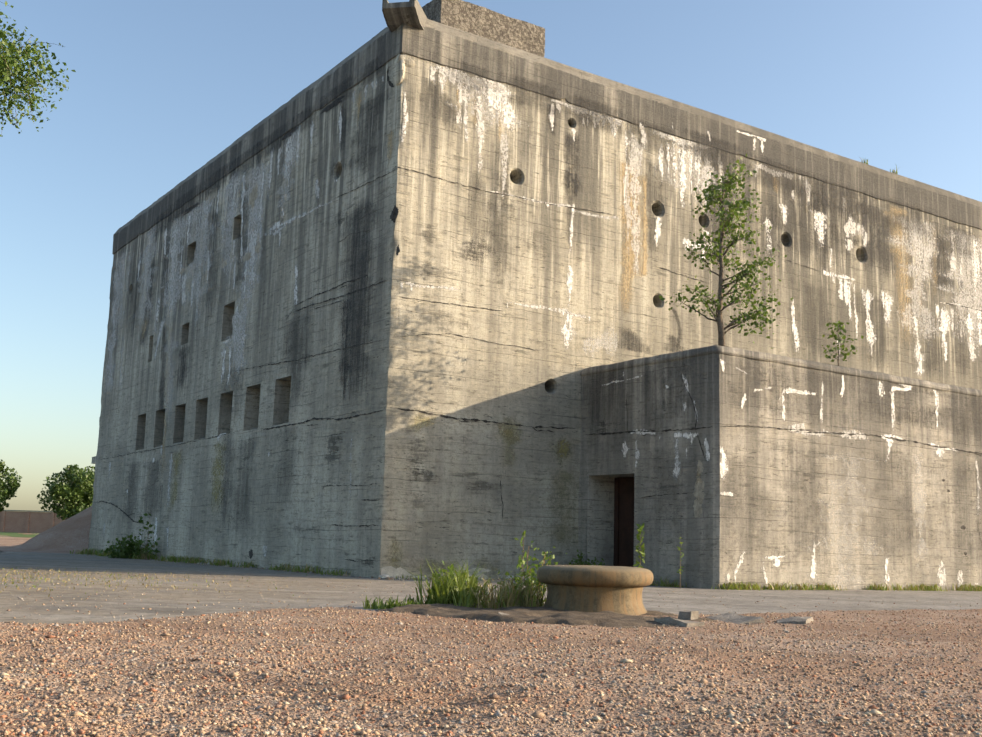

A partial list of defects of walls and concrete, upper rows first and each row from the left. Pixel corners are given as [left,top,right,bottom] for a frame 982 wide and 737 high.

leakage [430,66,898,354]
leakage [342,202,377,393]
leakage [924,231,982,362]
efflorescence [913,317,924,376]
crack [263,375,982,458]
leakage [621,429,660,467]
leakage [673,432,728,479]
crack [94,501,143,524]
crack [322,483,377,501]